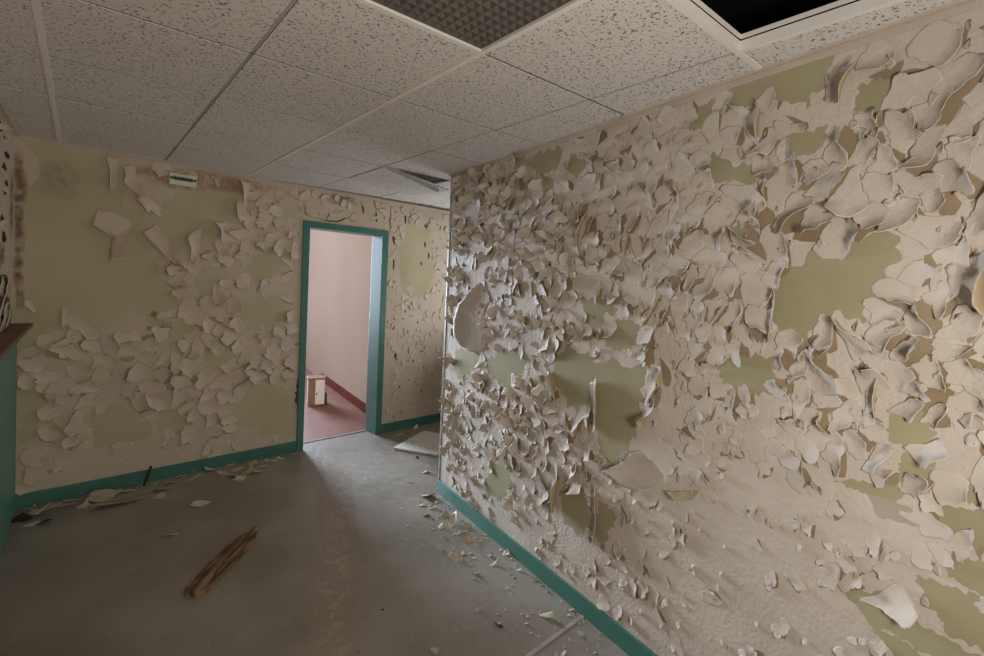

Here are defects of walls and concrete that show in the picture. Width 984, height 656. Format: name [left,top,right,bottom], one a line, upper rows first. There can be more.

spalling [0,121,15,196]
peeling [0,139,364,496]
peeling [370,19,984,656]